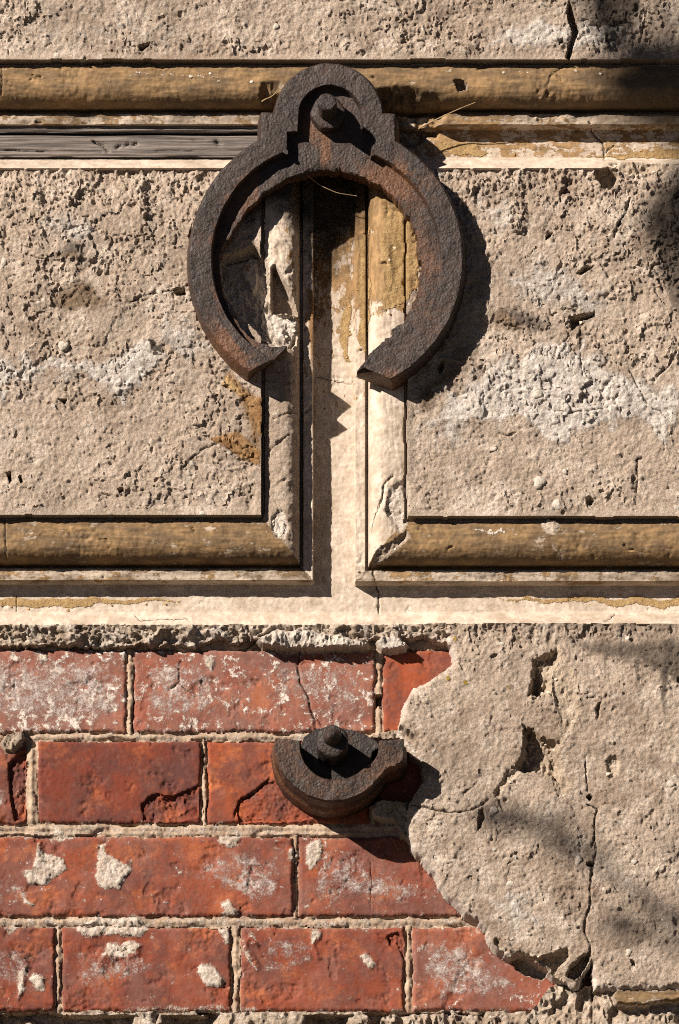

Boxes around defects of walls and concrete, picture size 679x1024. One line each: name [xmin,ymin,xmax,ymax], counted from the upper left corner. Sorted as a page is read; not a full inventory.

rust [307,289,315,377]
spalling [0,623,448,652]
crack [297,652,320,724]
spalling [493,645,582,801]
spalling [7,750,28,823]
spalling [141,786,200,824]
spalling [237,782,314,824]
crack [408,785,482,813]
crack [584,760,598,981]
spalling [0,932,679,1024]